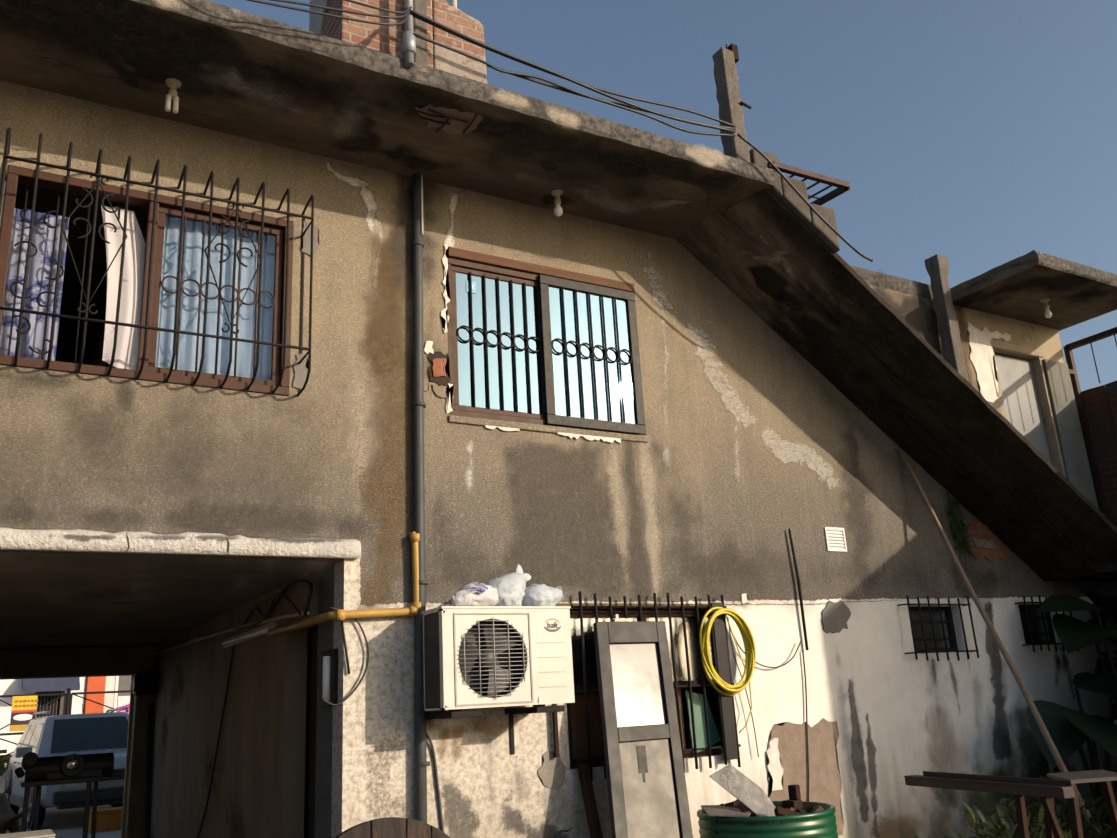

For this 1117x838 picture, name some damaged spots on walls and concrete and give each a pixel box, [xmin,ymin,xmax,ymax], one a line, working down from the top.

damp [471,117,730,187]
damp [0,0,464,606]
flaking render [440,244,451,333]
damp [749,256,792,300]
flaking render [423,341,454,413]
flaking render [688,320,838,489]
flaking render [967,322,1011,403]
damp [508,439,669,603]
flaking render [963,520,1014,562]
damp [985,602,1061,773]
peeling [765,738,783,791]
damp [849,680,879,838]